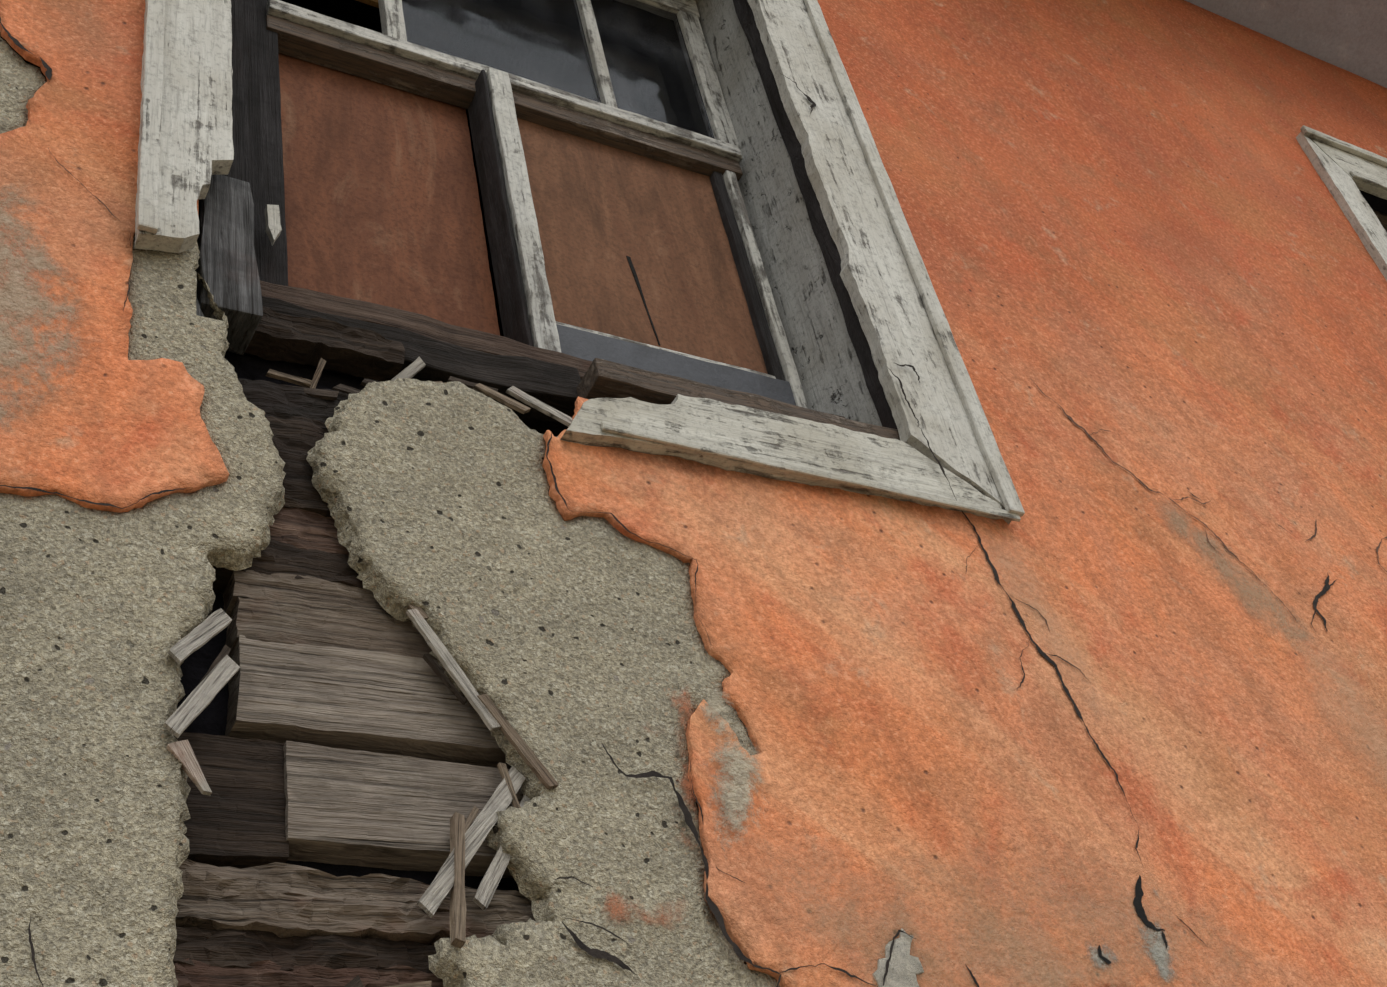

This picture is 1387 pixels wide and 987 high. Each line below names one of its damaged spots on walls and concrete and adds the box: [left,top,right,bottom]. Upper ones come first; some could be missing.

flaking render [0,17,52,134]
crack [780,73,816,114]
peeling [265,204,282,245]
flaking render [0,233,286,987]
flaking render [306,378,780,987]
crack [887,363,1208,980]
crack [1030,378,1337,631]
crack [602,744,876,987]
flaking render [872,928,924,987]